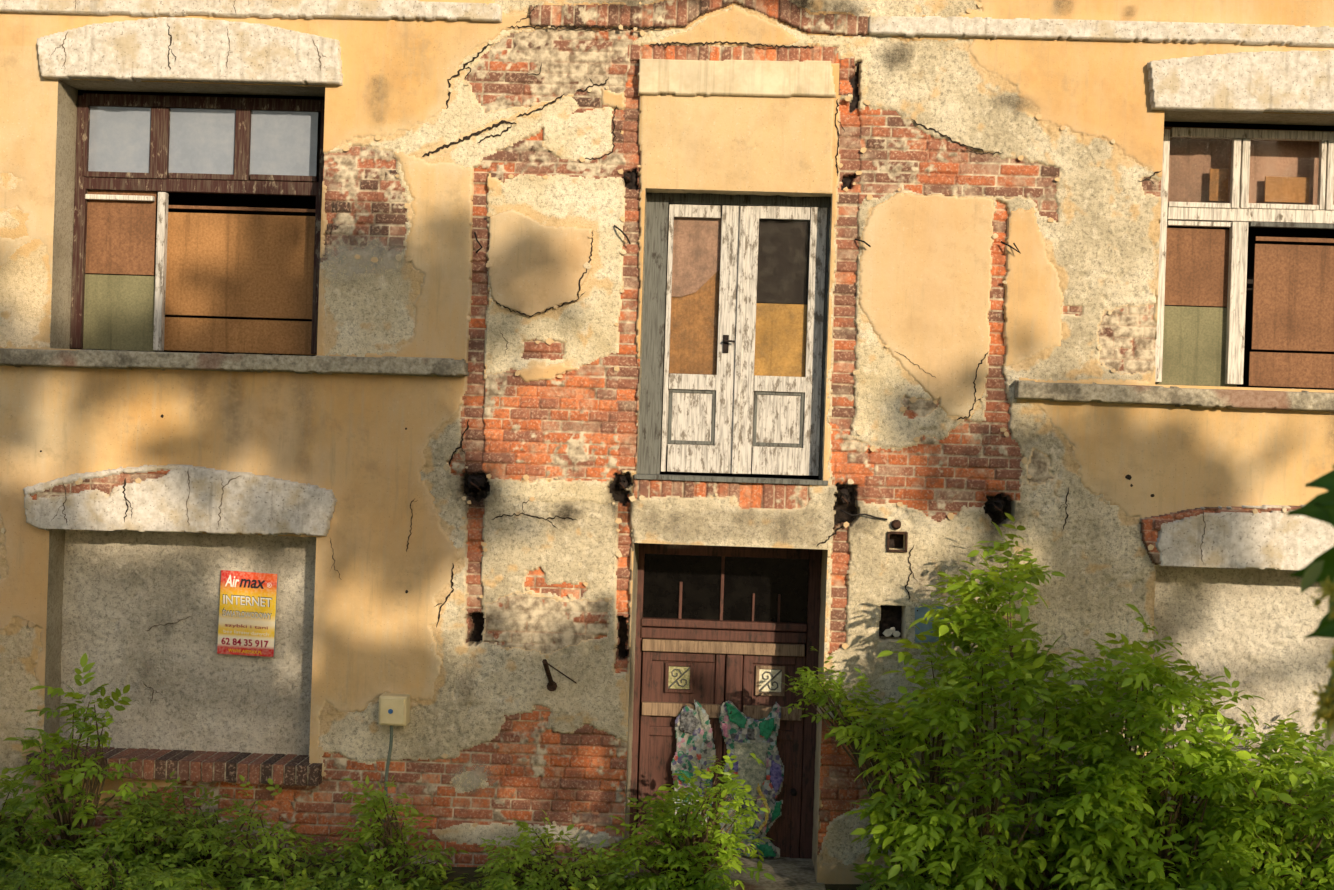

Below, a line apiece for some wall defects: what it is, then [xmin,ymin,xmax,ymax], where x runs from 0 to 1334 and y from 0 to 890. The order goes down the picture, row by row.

crack [167,25,176,69]
crack [446,4,814,109]
peeling [788,0,983,18]
crack [422,63,617,160]
peeling [79,0,810,877]
peeling [817,36,1301,865]
crack [122,478,133,522]
crack [186,472,239,527]
crack [491,500,576,527]
peeling [0,617,45,817]